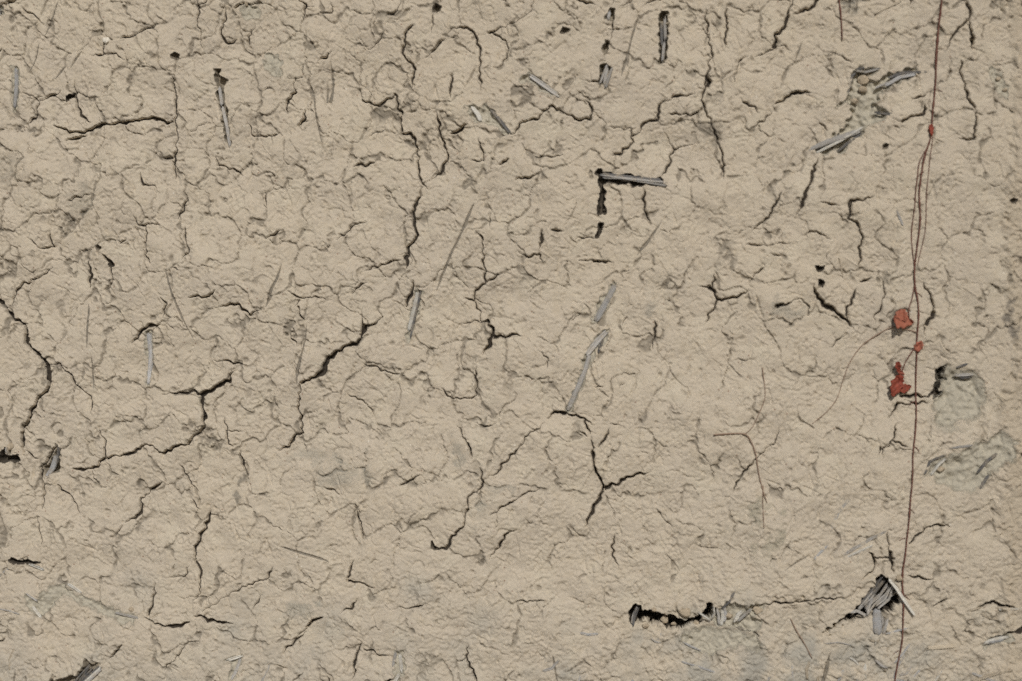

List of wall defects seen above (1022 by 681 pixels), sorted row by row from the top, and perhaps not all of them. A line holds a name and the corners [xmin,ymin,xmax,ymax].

crack [946,0,977,141]
crack [25,77,206,192]
crack [88,200,190,290]
crack [279,0,819,451]
crack [702,159,886,347]
crack [923,283,935,338]
crack [0,234,273,667]
crack [433,411,645,555]
crack [879,393,930,455]
crack [284,559,376,652]
crack [862,524,949,606]
crack [978,600,1022,638]